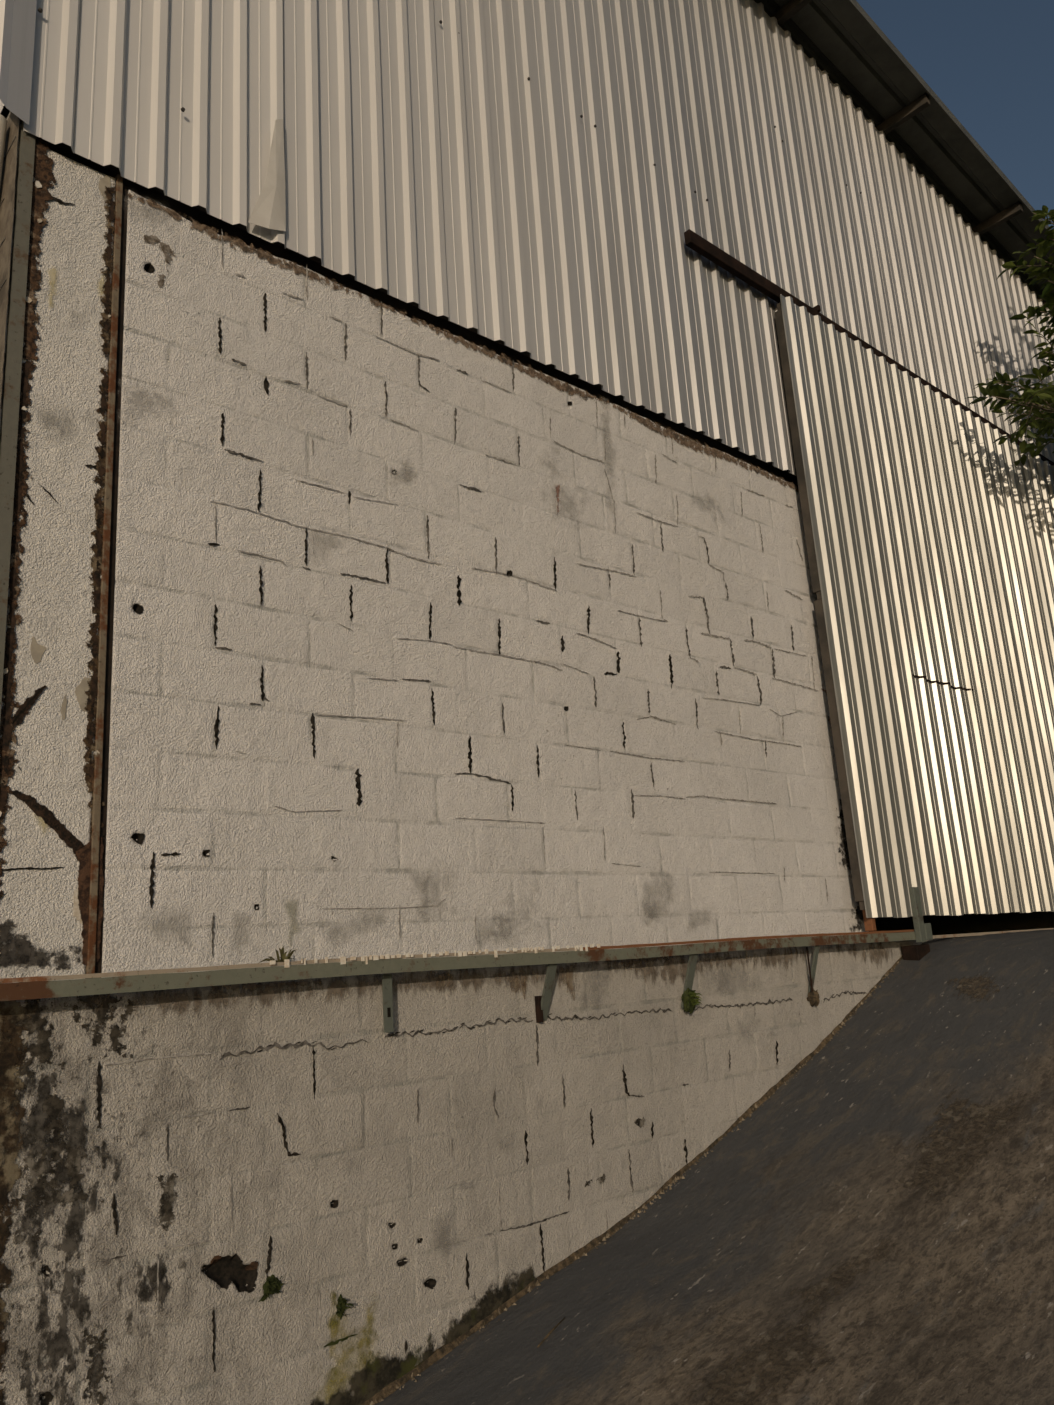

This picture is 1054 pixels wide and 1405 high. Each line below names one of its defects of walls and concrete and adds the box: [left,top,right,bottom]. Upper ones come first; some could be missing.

crack [218,232,515,440]
crack [208,401,819,867]
crack [11,685,47,730]
crack [1,766,105,871]
crack [149,852,181,908]
leakage [73,963,576,1063]
leakage [596,942,892,984]
crack [166,1107,300,1162]
crack [220,990,867,1290]
leakage [0,999,124,1405]
leakage [153,1173,179,1238]
leakage [116,1248,186,1332]